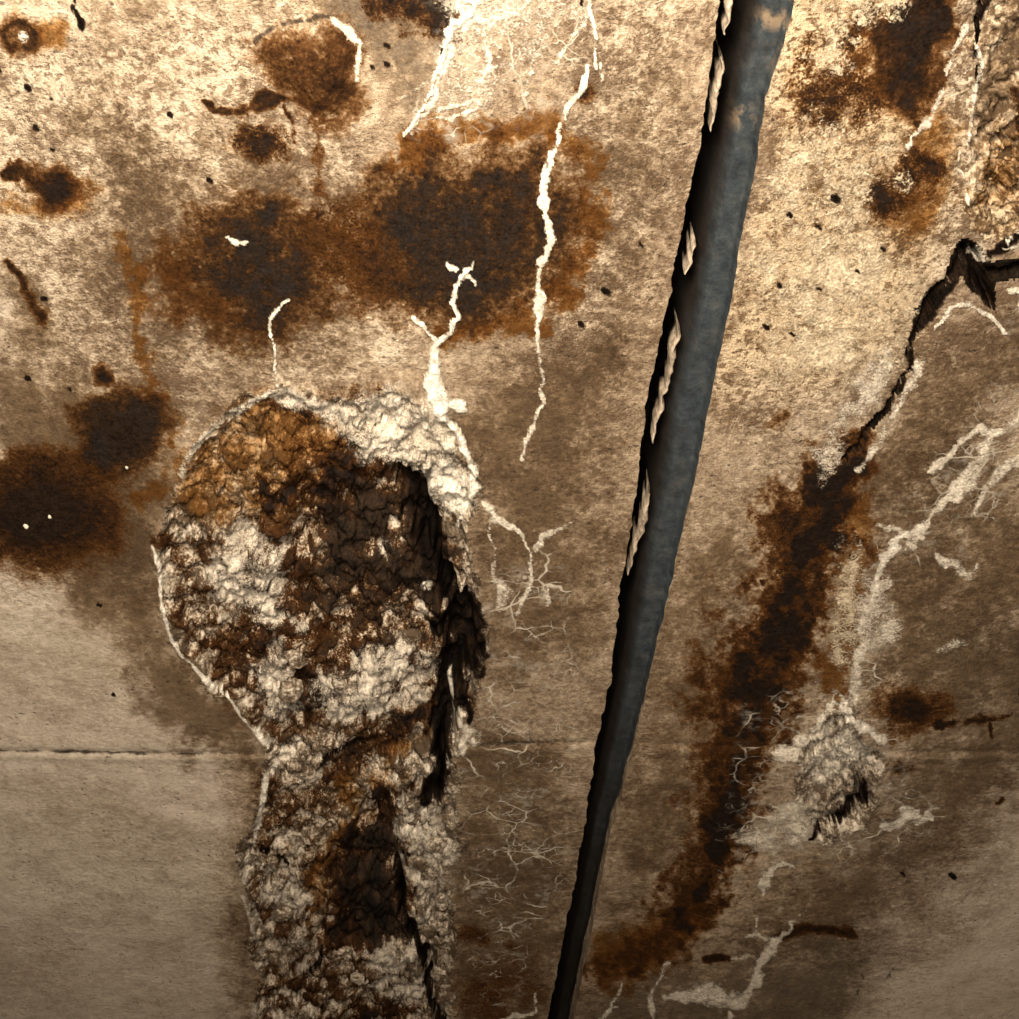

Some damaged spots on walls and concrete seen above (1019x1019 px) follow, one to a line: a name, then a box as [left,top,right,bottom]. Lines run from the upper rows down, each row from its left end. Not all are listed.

crack [70,0,86,31]
damp [401,0,589,137]
corrosion [782,0,962,138]
crack [905,0,992,206]
corrosion [147,127,598,345]
crack [520,0,604,462]
crack [841,231,1019,473]
corrosion [0,363,173,580]
damp [838,410,1019,716]
spalling [150,382,491,1019]
corrosion [583,425,878,989]
damp [647,910,807,1019]